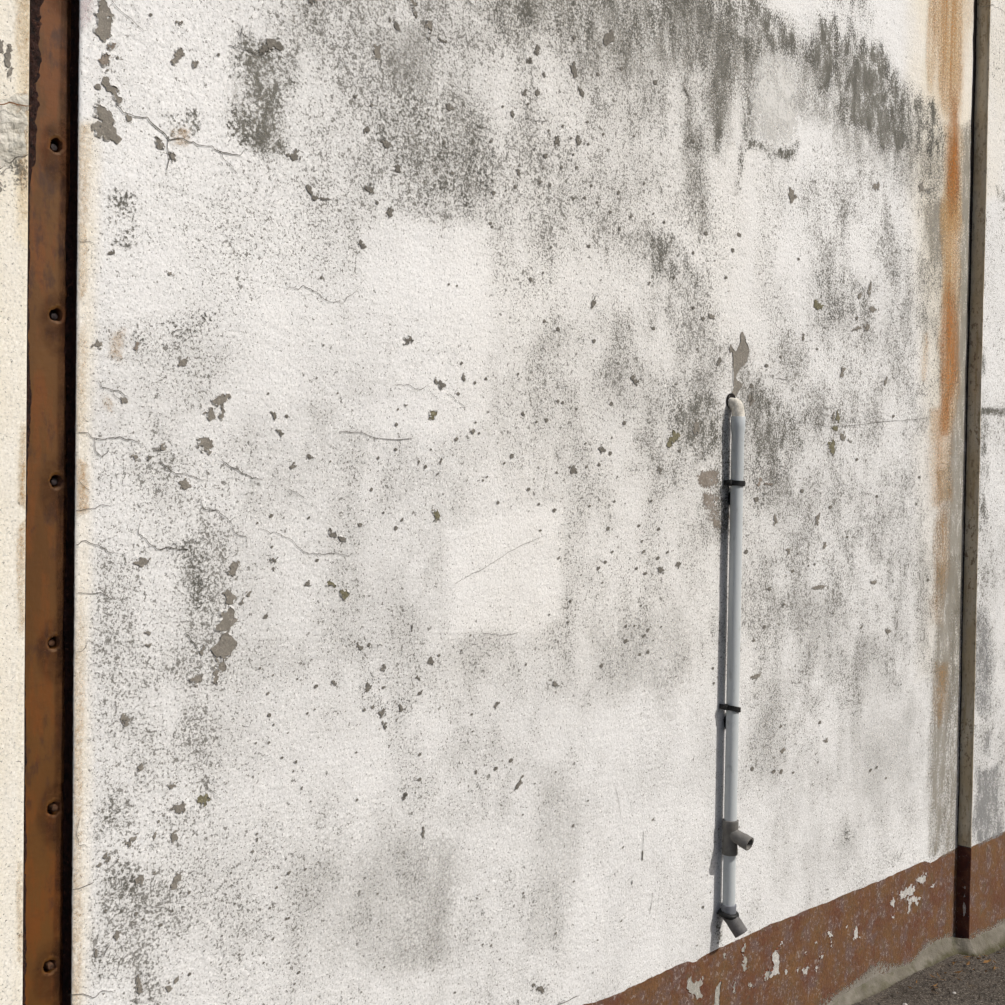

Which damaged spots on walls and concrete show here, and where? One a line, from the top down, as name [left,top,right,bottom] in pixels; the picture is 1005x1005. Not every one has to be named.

peeling [0,39,14,77]
crack [115,103,248,174]
water stain [226,29,296,163]
water stain [365,36,503,219]
rust [931,0,959,495]
peeling [717,332,755,407]
water stain [475,0,972,857]
rust [58,0,87,1005]
crack [138,523,186,553]
crack [161,459,349,556]
peeling [187,589,252,687]
peeling [890,872,936,919]